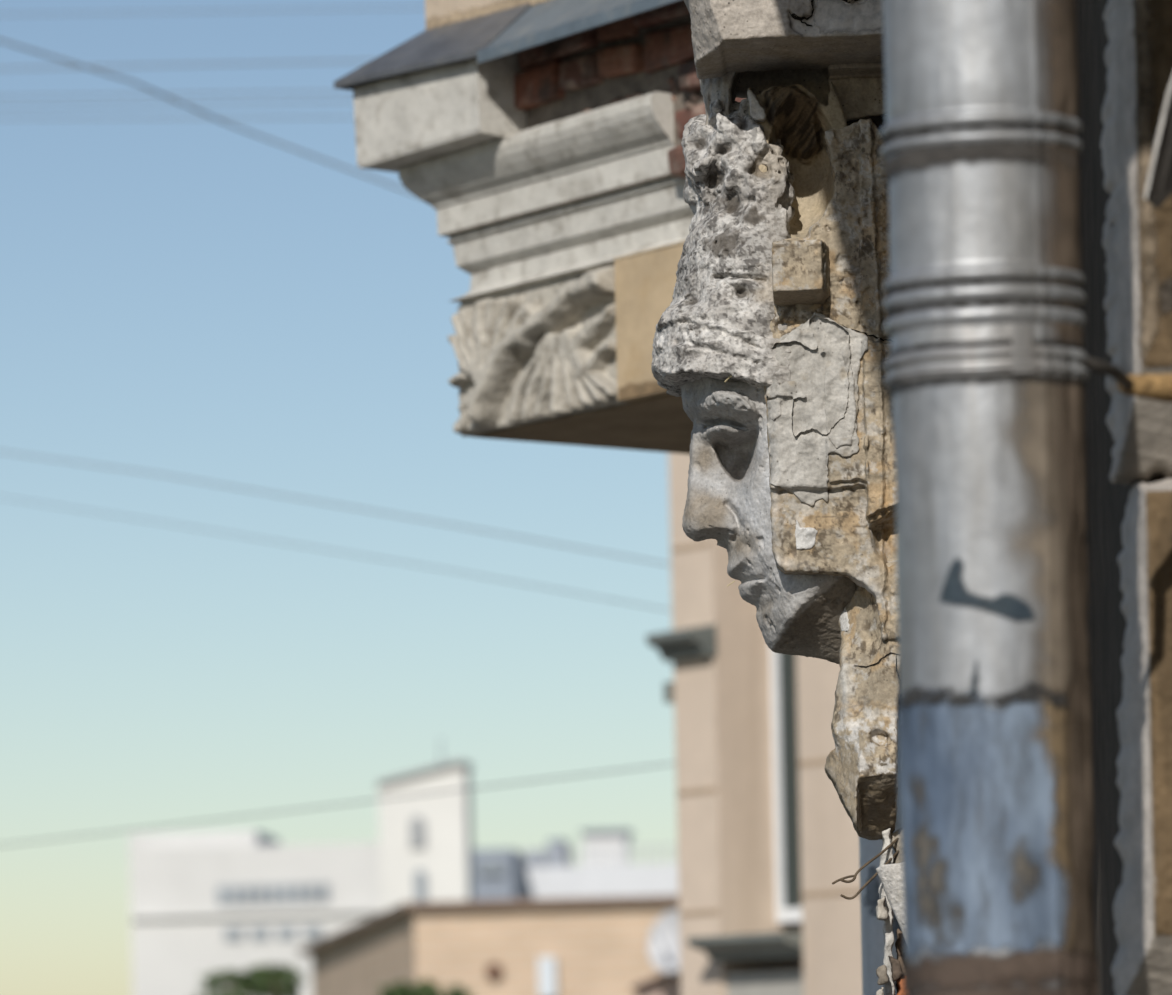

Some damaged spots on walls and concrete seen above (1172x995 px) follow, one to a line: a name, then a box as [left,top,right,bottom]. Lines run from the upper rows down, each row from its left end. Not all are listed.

crack [789,0,814,26]
flaking render [766,312,868,507]
flaking render [795,520,818,550]
flaking render [839,607,850,632]